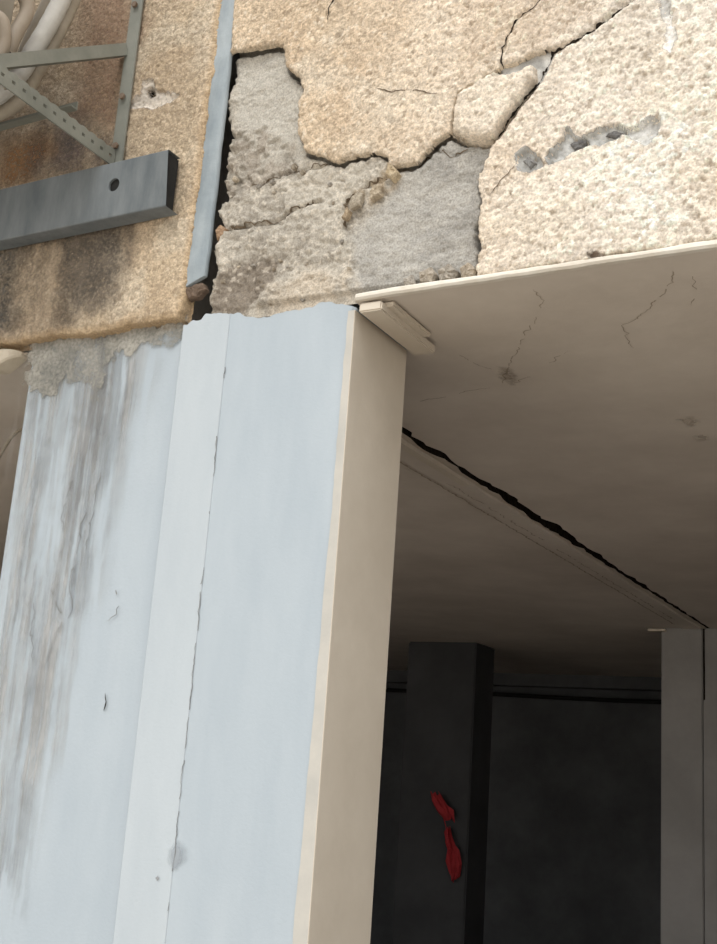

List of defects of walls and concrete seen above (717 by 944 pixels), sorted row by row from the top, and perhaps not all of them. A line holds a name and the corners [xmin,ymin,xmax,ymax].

crack [376,87,436,95]
flaking render [497,52,555,87]
crack [498,0,633,138]
flaking render [186,47,490,318]
crack [621,272,697,347]
peeling [25,322,183,399]
crack [400,461,675,624]